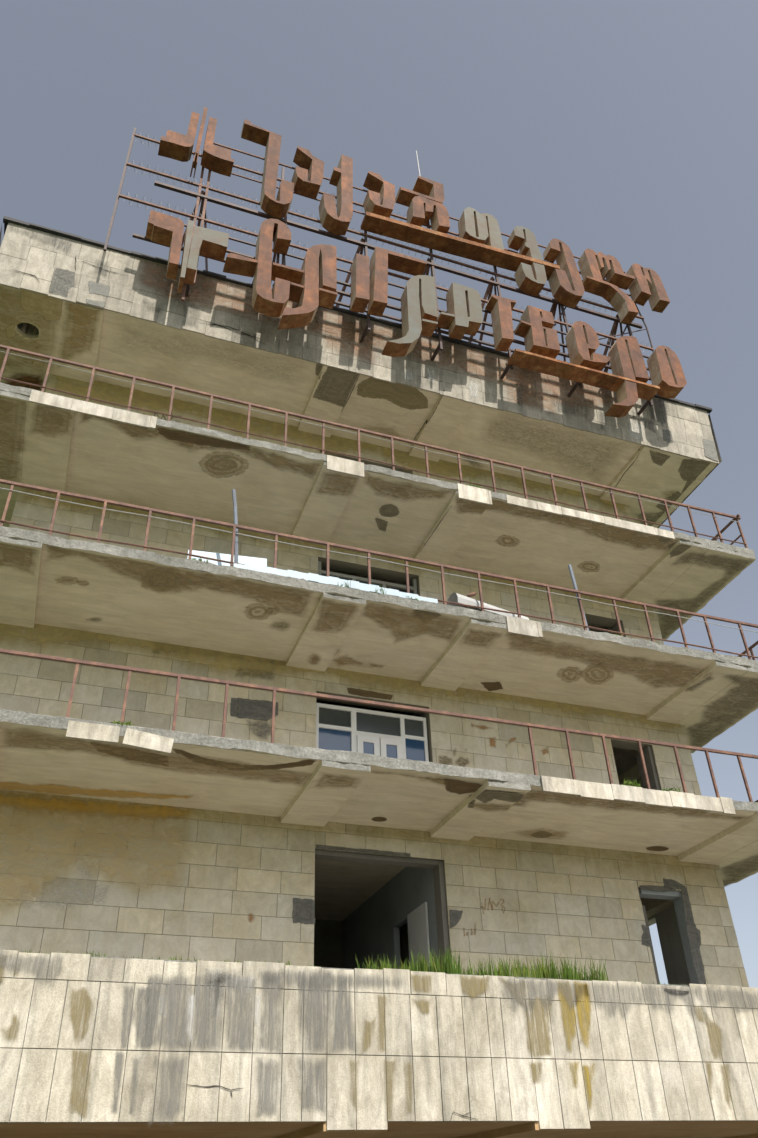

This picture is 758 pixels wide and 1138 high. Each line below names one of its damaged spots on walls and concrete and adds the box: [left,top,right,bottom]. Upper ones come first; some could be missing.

leakage [62,303,100,359]
leakage [0,375,674,552]
leakage [0,543,33,572]
leakage [47,546,711,690]
leakage [564,554,748,637]
leakage [0,618,758,745]
leakage [0,782,187,818]
leakage [8,732,307,783]
leakage [113,971,399,1118]
leakage [413,976,431,1013]
leakage [503,980,753,1108]
spalling [640,878,706,995]